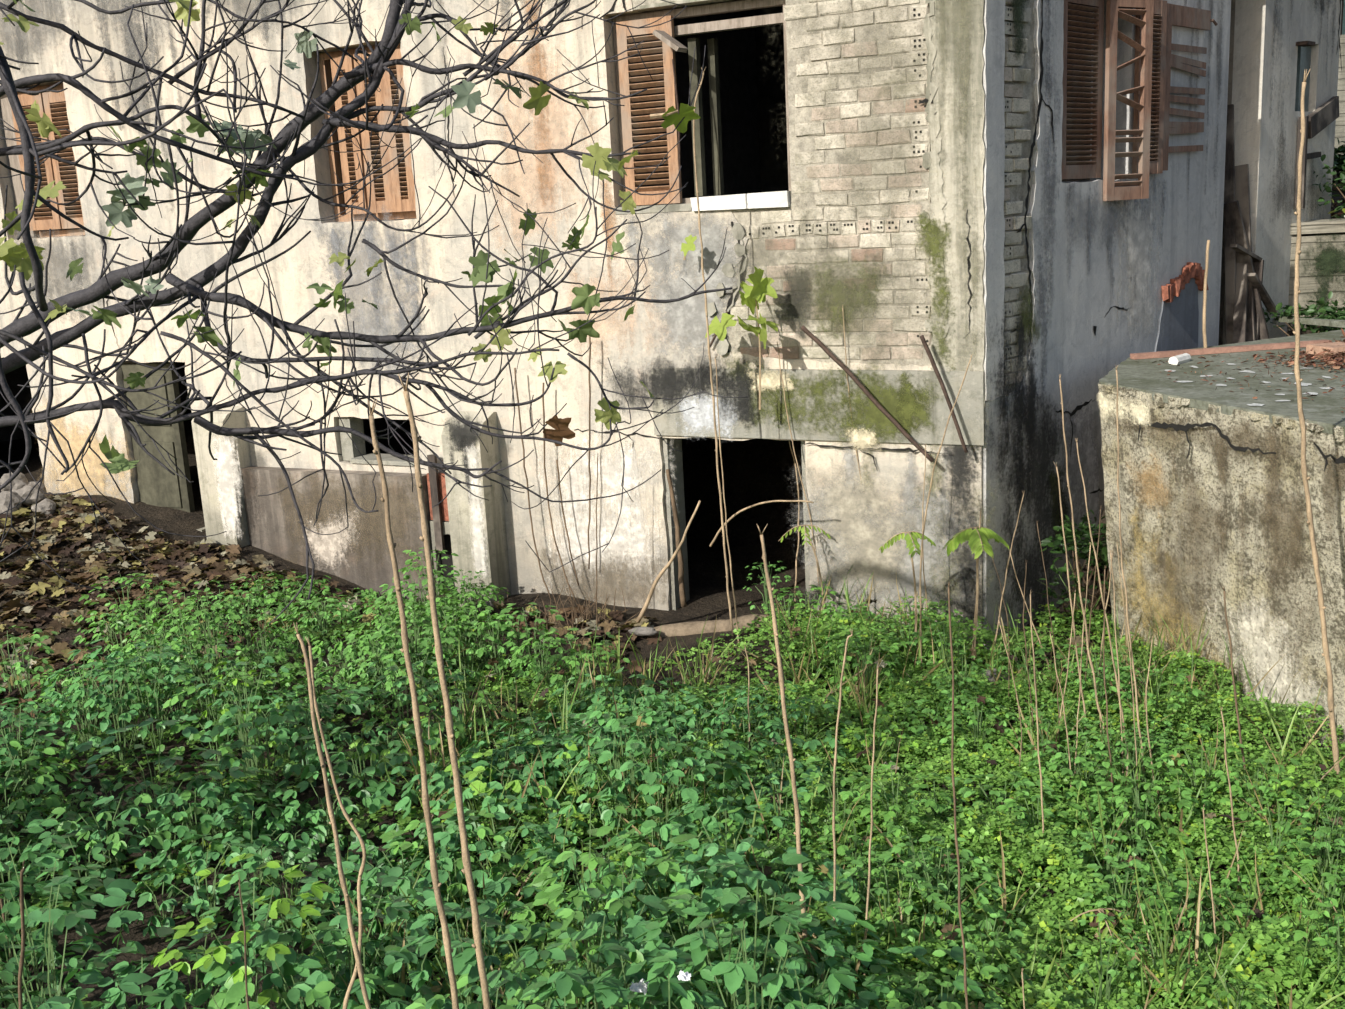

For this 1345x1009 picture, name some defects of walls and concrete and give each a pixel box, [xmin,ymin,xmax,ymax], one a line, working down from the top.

crack [1017,0,1054,346]
damp [782,269,813,337]
spalling [1154,262,1209,352]
damp [600,354,780,435]
damp [986,118,1165,623]
crack [1056,399,1276,459]
crack [1314,442,1345,471]